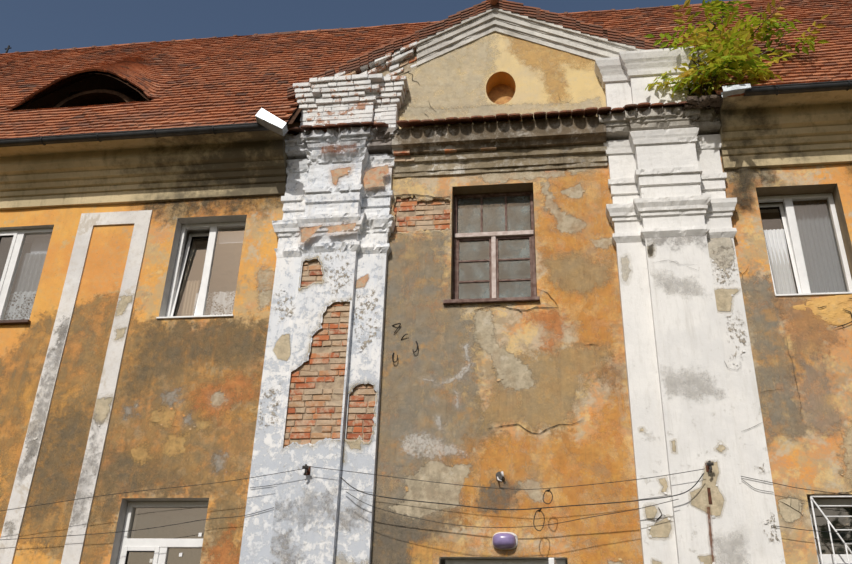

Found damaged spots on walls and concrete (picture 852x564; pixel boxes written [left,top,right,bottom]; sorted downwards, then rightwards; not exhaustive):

peeling [331,167,351,185]
peeling [363,165,389,188]
flaking render [391,195,452,234]
flaking render [256,223,379,463]
peeling [473,309,538,392]
water stain [741,275,842,443]
water stain [0,294,269,564]
crack [488,421,579,434]
peeling [388,460,471,519]
peeling [690,442,726,518]